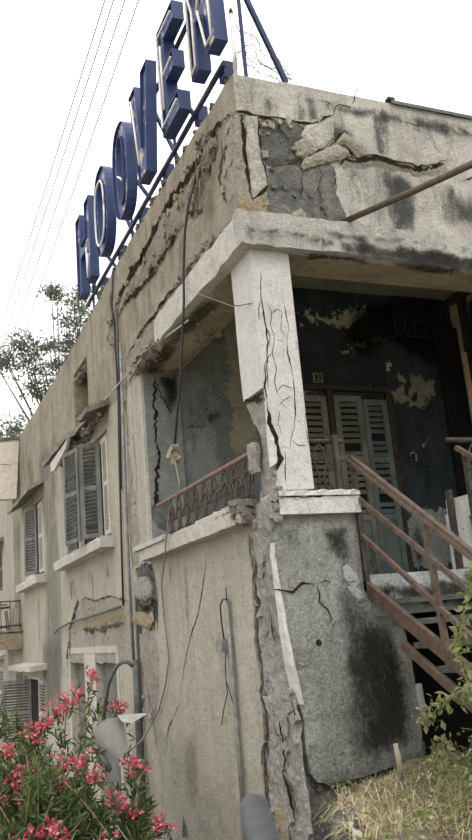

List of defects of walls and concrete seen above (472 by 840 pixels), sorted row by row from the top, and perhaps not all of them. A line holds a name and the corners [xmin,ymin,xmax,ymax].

flaking render [106,115,346,355]
crack [110,89,472,322]
leakage [287,231,472,273]
leakage [384,172,414,230]
leakage [416,120,469,135]
crack [124,251,203,538]
crack [186,271,347,499]
peeling [386,359,439,410]
flaking render [70,488,159,725]
flaking render [127,278,396,840]
crack [247,535,332,840]
leakage [345,608,408,753]